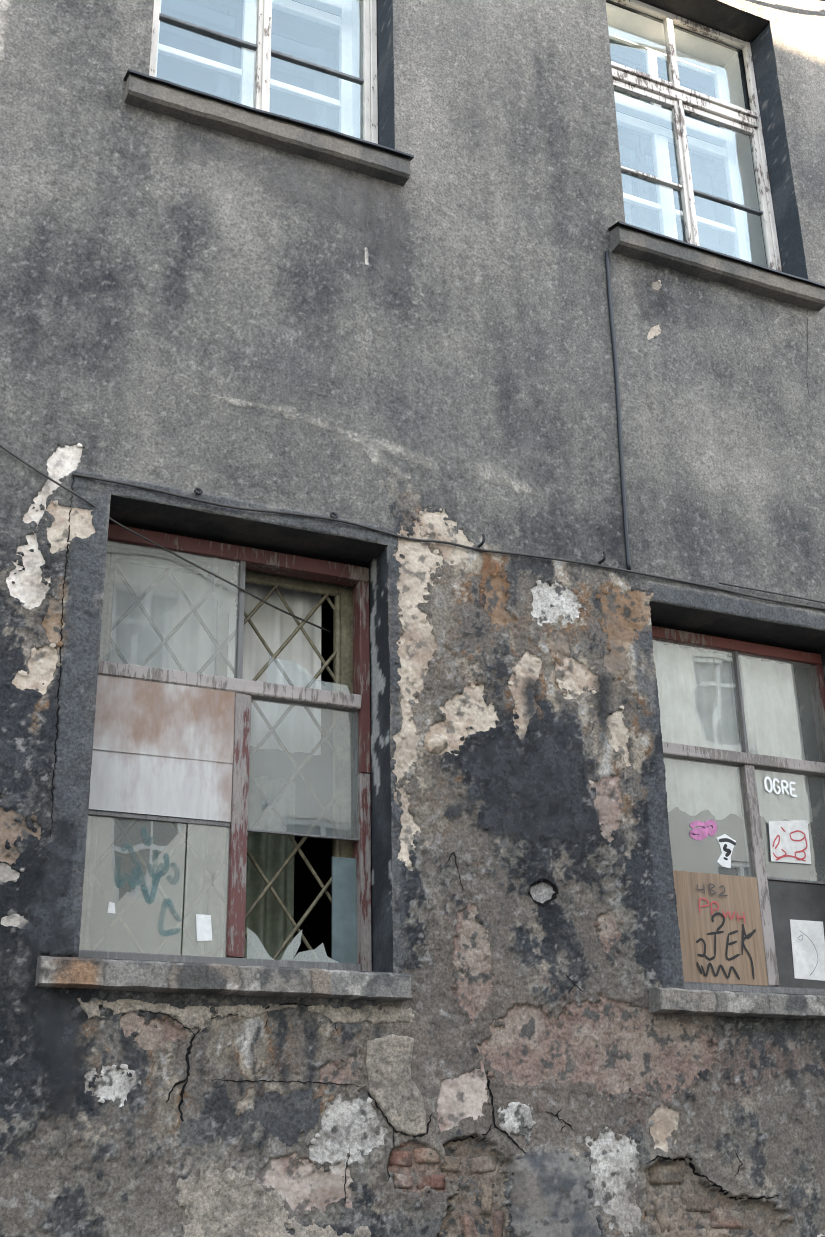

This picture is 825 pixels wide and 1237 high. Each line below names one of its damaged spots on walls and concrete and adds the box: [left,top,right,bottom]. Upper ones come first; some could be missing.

flaking render [6,440,95,695]
rust [478,548,517,626]
flaking render [392,505,654,871]
water stain [524,679,538,732]
water stain [596,676,610,743]
flaking render [0,795,41,883]
flaking render [1,914,28,929]
crack [141,1002,526,1179]
flaking render [77,993,795,1237]
crack [545,1110,575,1132]
crack [343,1147,351,1195]
crack [646,1151,779,1200]